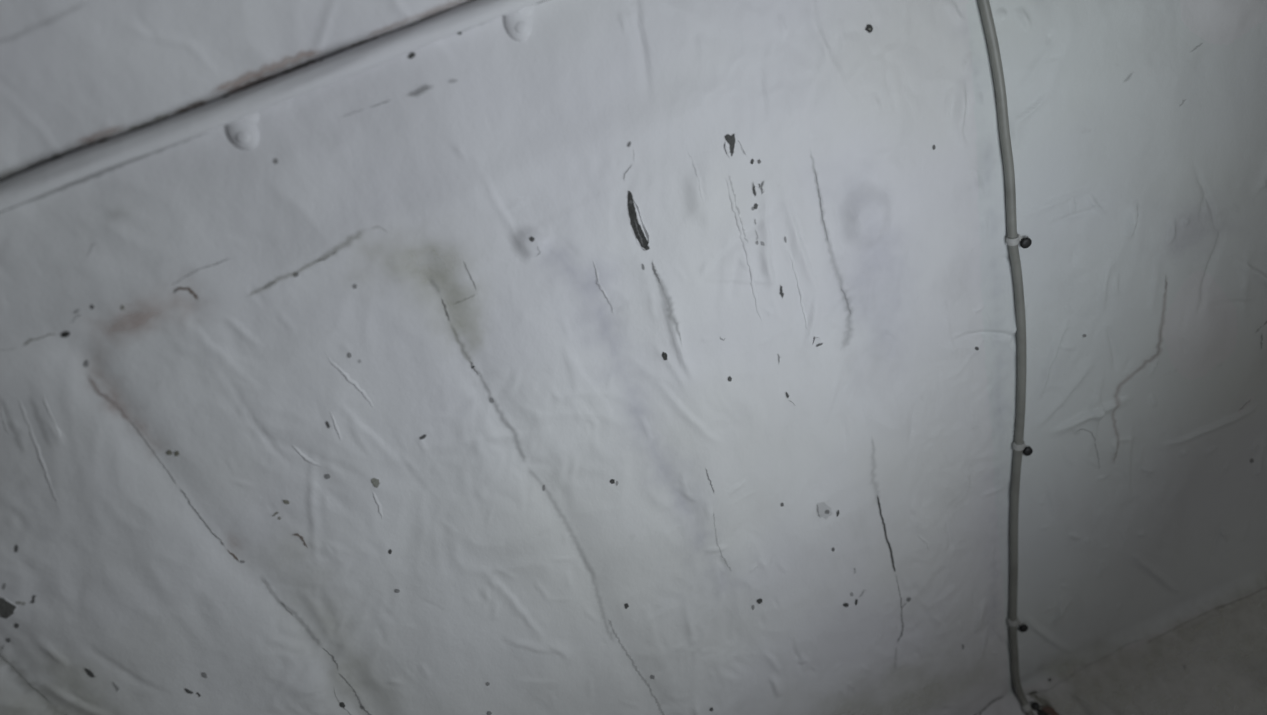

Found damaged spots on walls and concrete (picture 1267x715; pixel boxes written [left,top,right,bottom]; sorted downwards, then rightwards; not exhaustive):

crack [877,497,895,571]